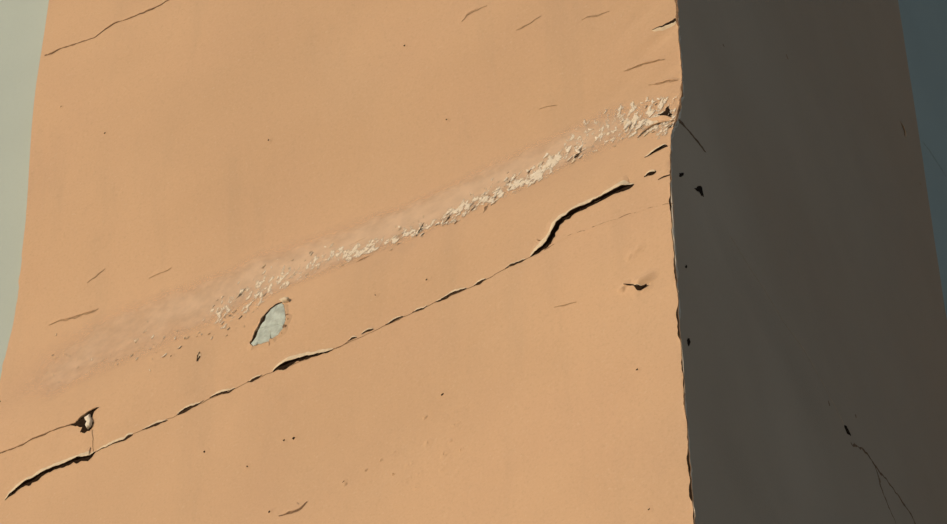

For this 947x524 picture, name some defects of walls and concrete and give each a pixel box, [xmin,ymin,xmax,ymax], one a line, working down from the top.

crack [45,0,168,56]
crack [0,119,706,500]
peeling [110,0,695,523]
flaking render [71,406,98,433]
crack [844,425,916,524]